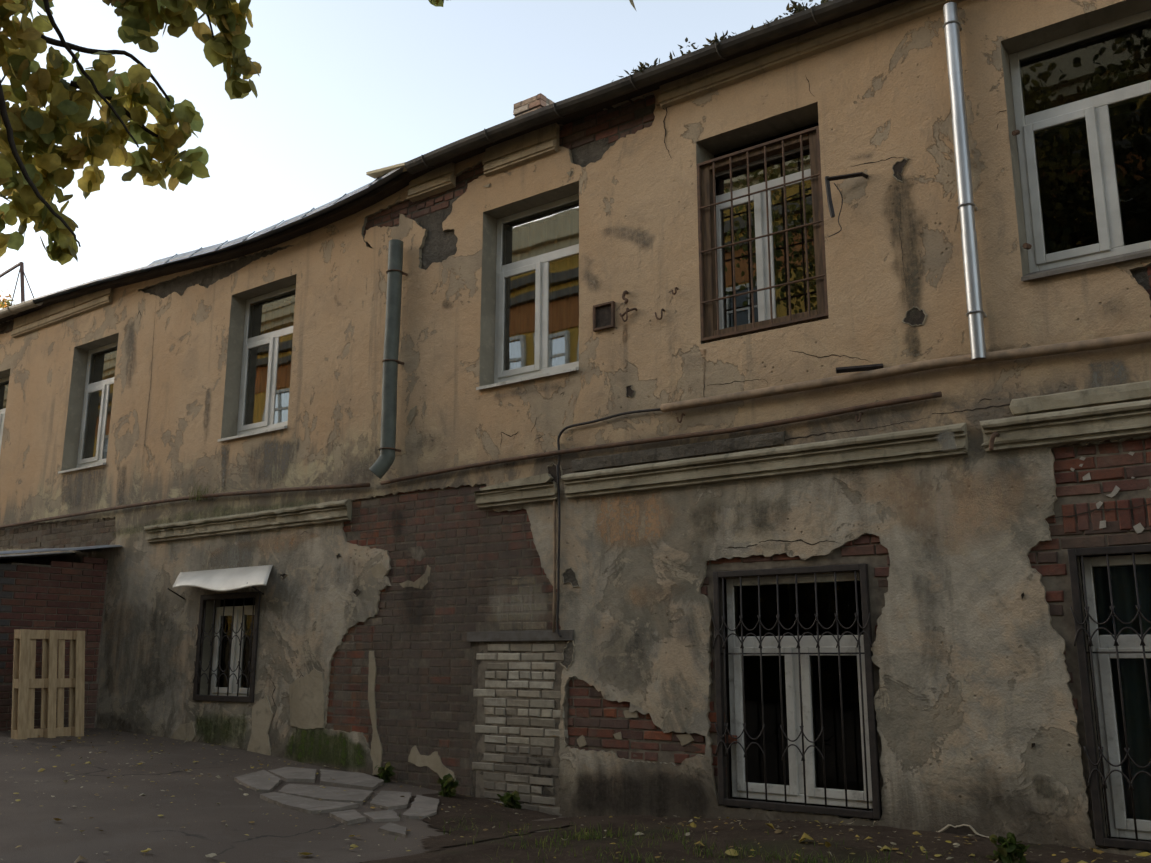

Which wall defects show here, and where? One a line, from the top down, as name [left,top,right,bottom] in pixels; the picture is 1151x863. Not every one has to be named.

flaking render [361,160,491,270]
flaking render [559,93,656,176]
water stain [890,179,921,357]
flaking render [1130,263,1151,317]
flaking render [324,462,890,822]
flaking render [1027,436,1151,853]